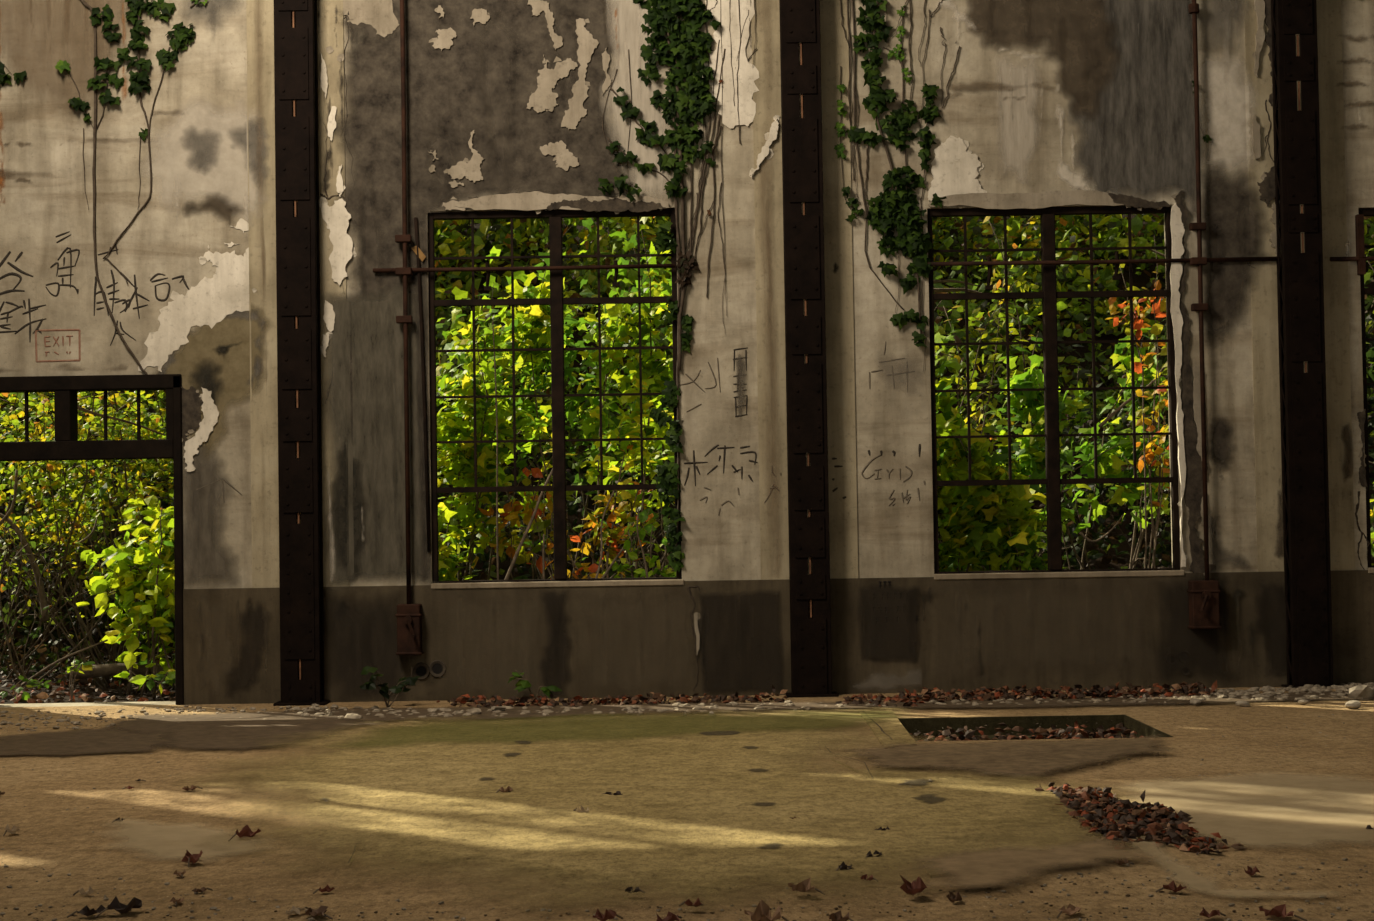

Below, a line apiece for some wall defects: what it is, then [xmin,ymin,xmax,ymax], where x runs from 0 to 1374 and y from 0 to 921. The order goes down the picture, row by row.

peeling [343,0,399,37]
peeling [429,5,457,51]
peeling [470,8,490,25]
peeling [317,31,344,141]
peeling [526,0,612,171]
peeling [429,130,484,211]
spalling [547,197,666,214]
peeling [749,115,779,178]
leakage [940,0,1262,342]
peeling [138,218,257,372]
peeling [181,386,219,472]
leakage [1209,419,1232,468]